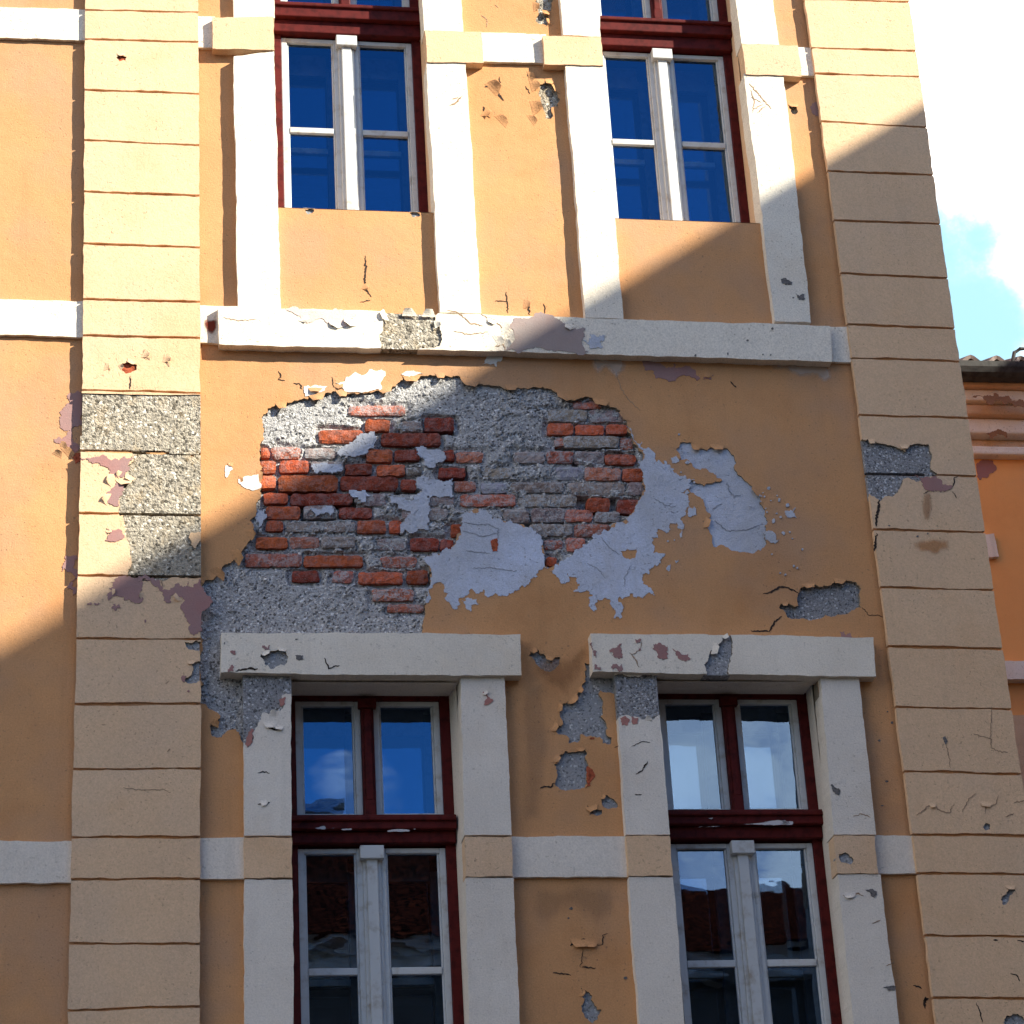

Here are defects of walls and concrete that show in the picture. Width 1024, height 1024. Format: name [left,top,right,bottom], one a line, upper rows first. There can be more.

flaking render [527,71,562,125]
crack [361,256,372,302]
flaking render [379,308,442,354]
flaking render [860,439,953,502]
crack [872,500,880,551]
flaking render [52,369,797,748]
crack [763,586,798,594]
flaking render [779,577,860,621]
crack [752,616,782,632]
flaking render [550,642,659,791]
crack [553,933,608,976]
flaking render [578,988,601,1023]